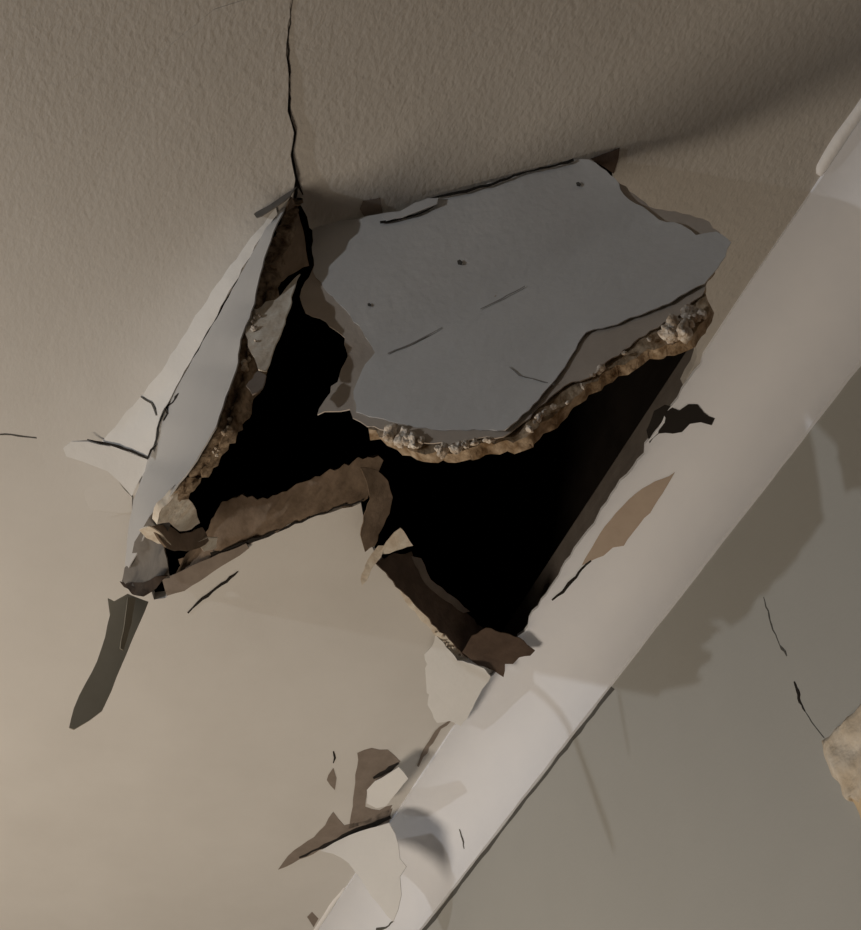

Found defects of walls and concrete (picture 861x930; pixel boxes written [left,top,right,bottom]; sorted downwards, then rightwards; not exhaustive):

crack [287,4,303,198]
peeling [254,186,297,218]
peeling [360,198,438,221]
spalling [646,404,714,443]
peeling [63,439,156,513]
peeling [582,472,675,565]
spalling [162,455,535,726]
peeling [278,748,408,930]